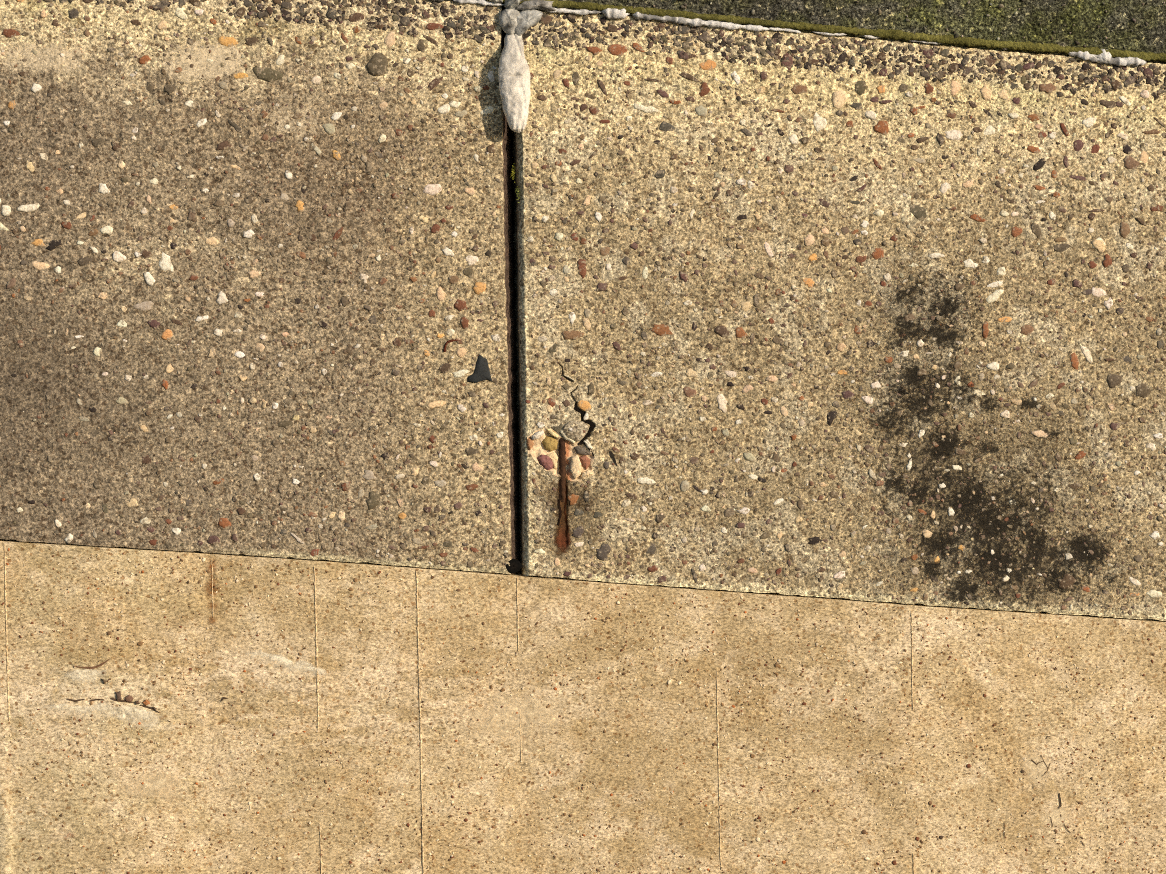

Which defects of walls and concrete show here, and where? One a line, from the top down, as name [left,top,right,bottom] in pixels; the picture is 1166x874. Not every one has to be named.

rust [555,476,570,553]
crack [557,362,595,457]
spalling [522,10,1166,616]
mould [866,260,1128,607]